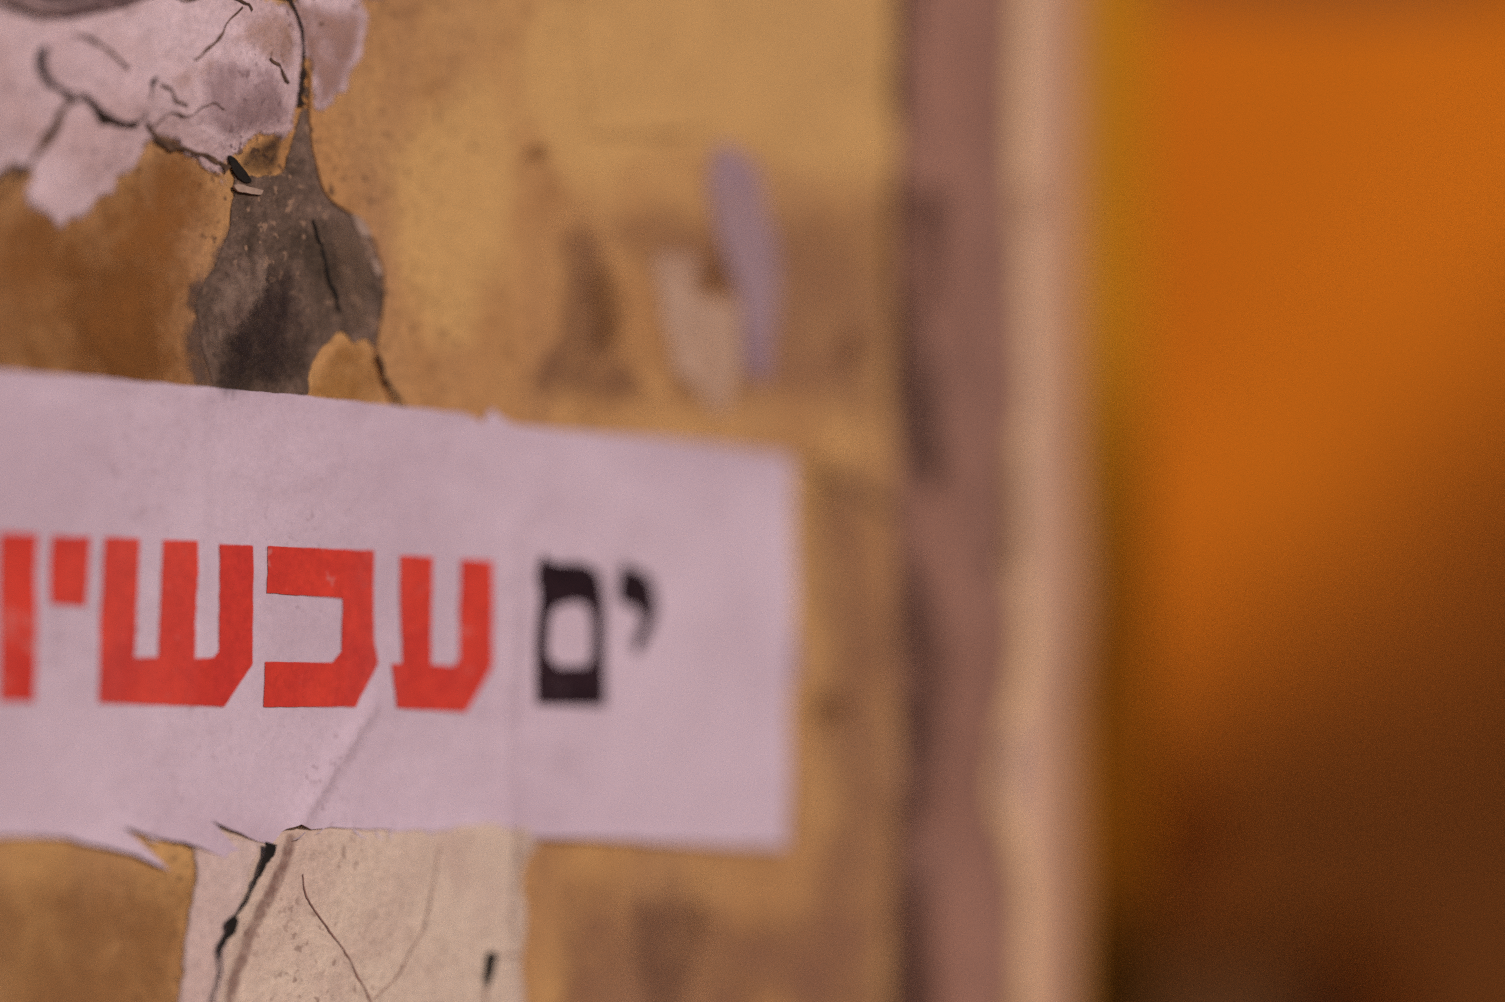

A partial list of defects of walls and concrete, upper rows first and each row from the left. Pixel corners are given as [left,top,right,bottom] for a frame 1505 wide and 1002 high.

peeling [0,0,400,402]
water stain [245,139,279,168]
flaking render [179,822,540,1002]